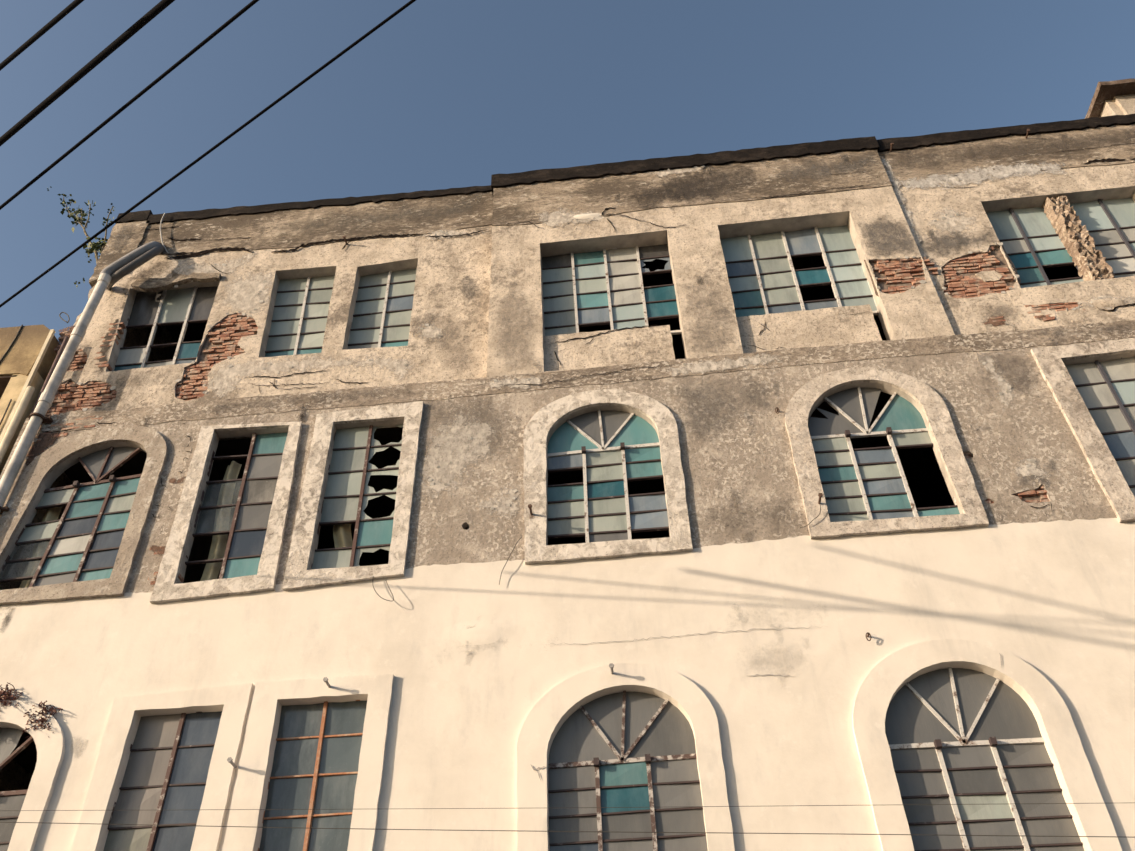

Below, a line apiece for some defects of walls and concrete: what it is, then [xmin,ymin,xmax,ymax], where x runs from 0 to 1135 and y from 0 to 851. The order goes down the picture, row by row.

crack [1046,143,1135,164]
water stain [632,169,751,204]
crack [147,221,541,274]
spalling [864,159,1066,303]
spalling [130,253,414,401]
spalling [984,315,1006,327]
spalling [1025,295,1135,322]
crack [1096,303,1135,311]
spalling [25,319,126,466]
spalling [1014,457,1050,503]